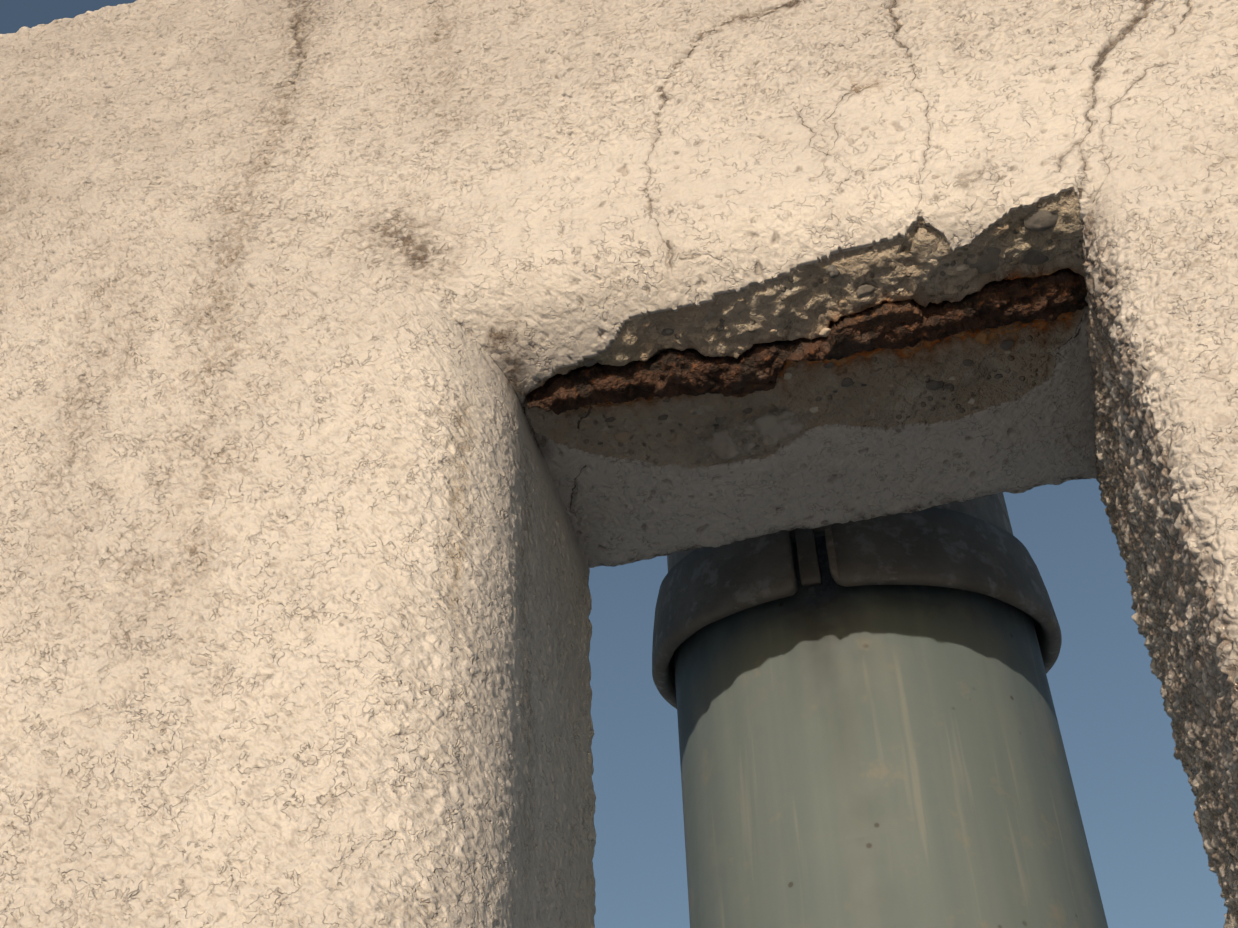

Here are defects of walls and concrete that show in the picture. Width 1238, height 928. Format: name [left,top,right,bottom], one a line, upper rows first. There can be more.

crack [659,0,800,110]
crack [849,0,909,50]
crack [1087,0,1150,118]
spalling [523,189,1086,469]
corrosion [831,300,923,333]
corrosion [710,312,1075,398]